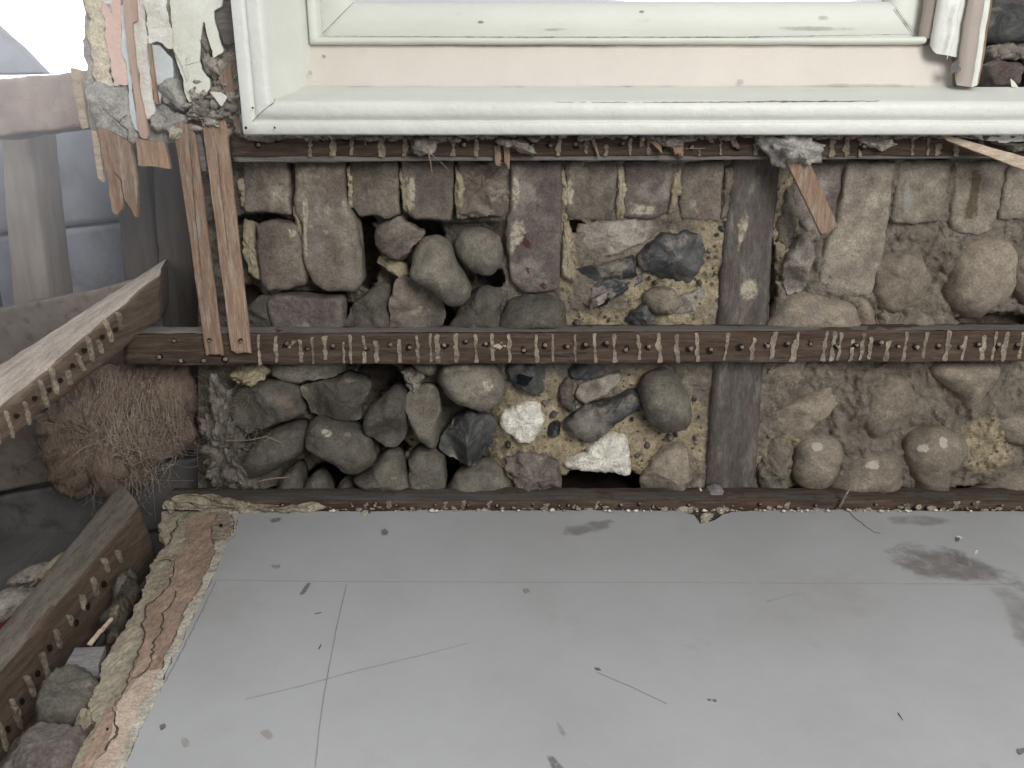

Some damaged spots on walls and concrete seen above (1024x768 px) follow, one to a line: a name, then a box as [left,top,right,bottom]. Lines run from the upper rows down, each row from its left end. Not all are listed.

peeling [84,0,128,86]
crack [104,519,261,751]